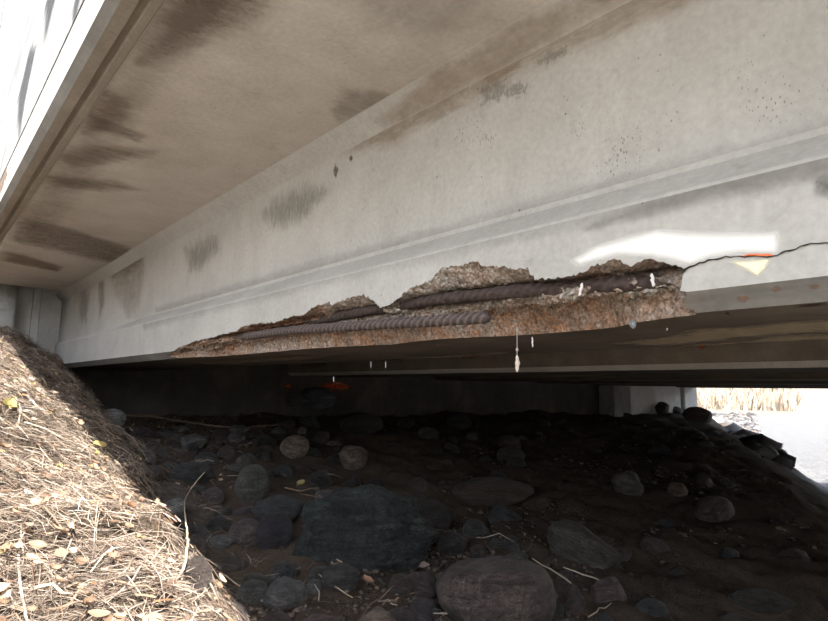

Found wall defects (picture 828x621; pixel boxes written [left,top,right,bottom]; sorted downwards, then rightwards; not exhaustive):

water stain [18,46,34,132]
water stain [26,223,127,262]
crack [682,242,828,272]
spalling [168,258,698,358]
water stain [634,322,828,345]